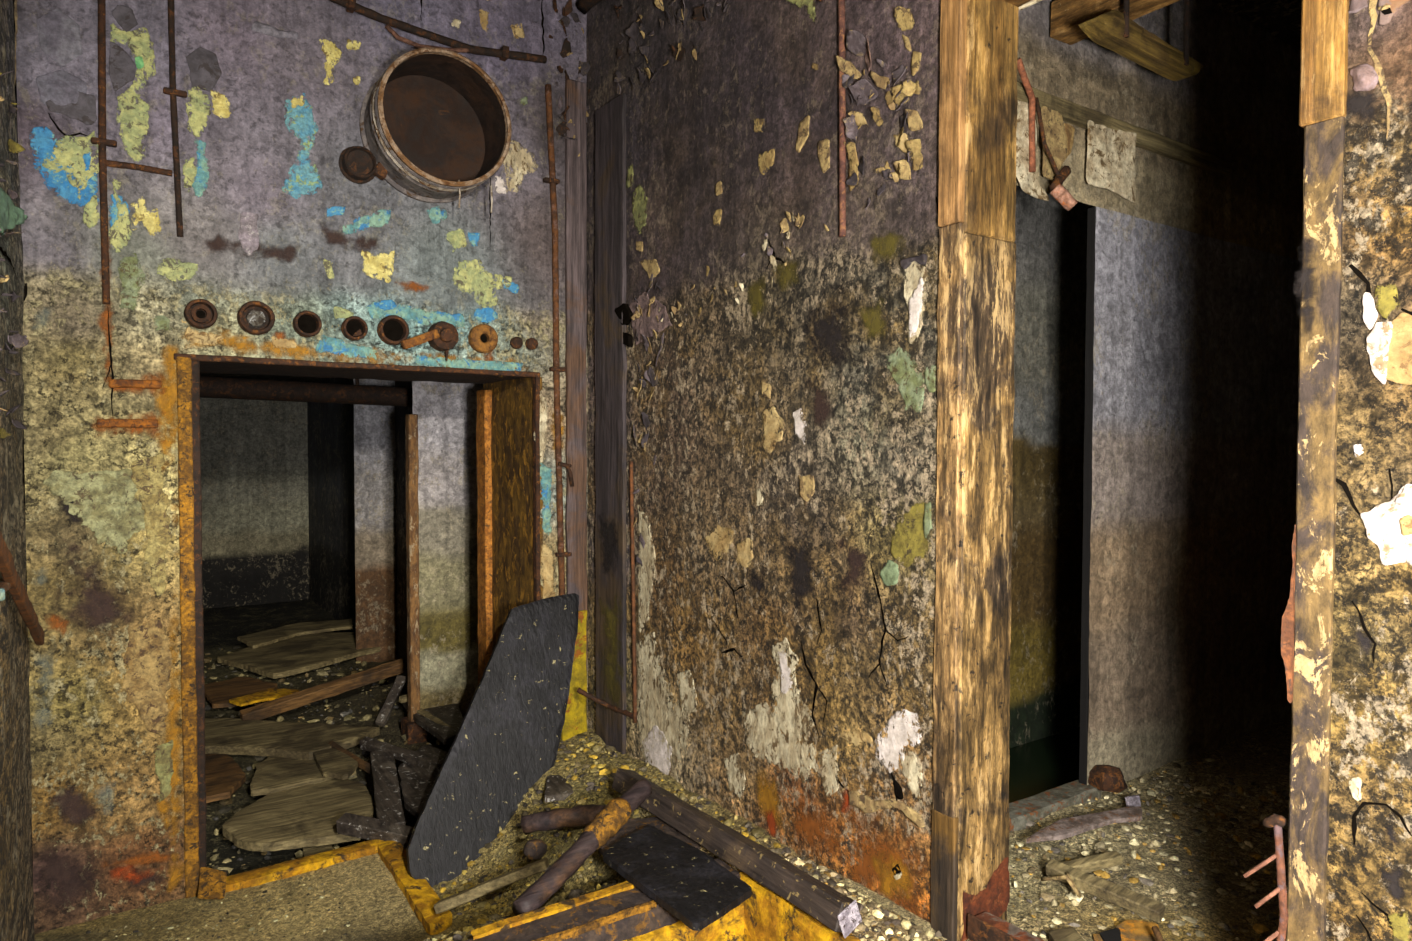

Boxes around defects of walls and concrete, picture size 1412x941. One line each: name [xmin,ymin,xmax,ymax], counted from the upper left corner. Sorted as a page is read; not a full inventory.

peeling [795,6,923,210]
peeling [0,91,198,313]
rust [217,331,315,359]
spalling [1362,284,1412,385]
crack [1336,478,1360,516]
spalling [1360,484,1412,566]
crack [1387,469,1395,500]
crack [1352,601,1376,663]
rust [158,673,182,835]
spalling [724,637,925,828]
rust [113,851,184,889]
rust [757,778,922,918]